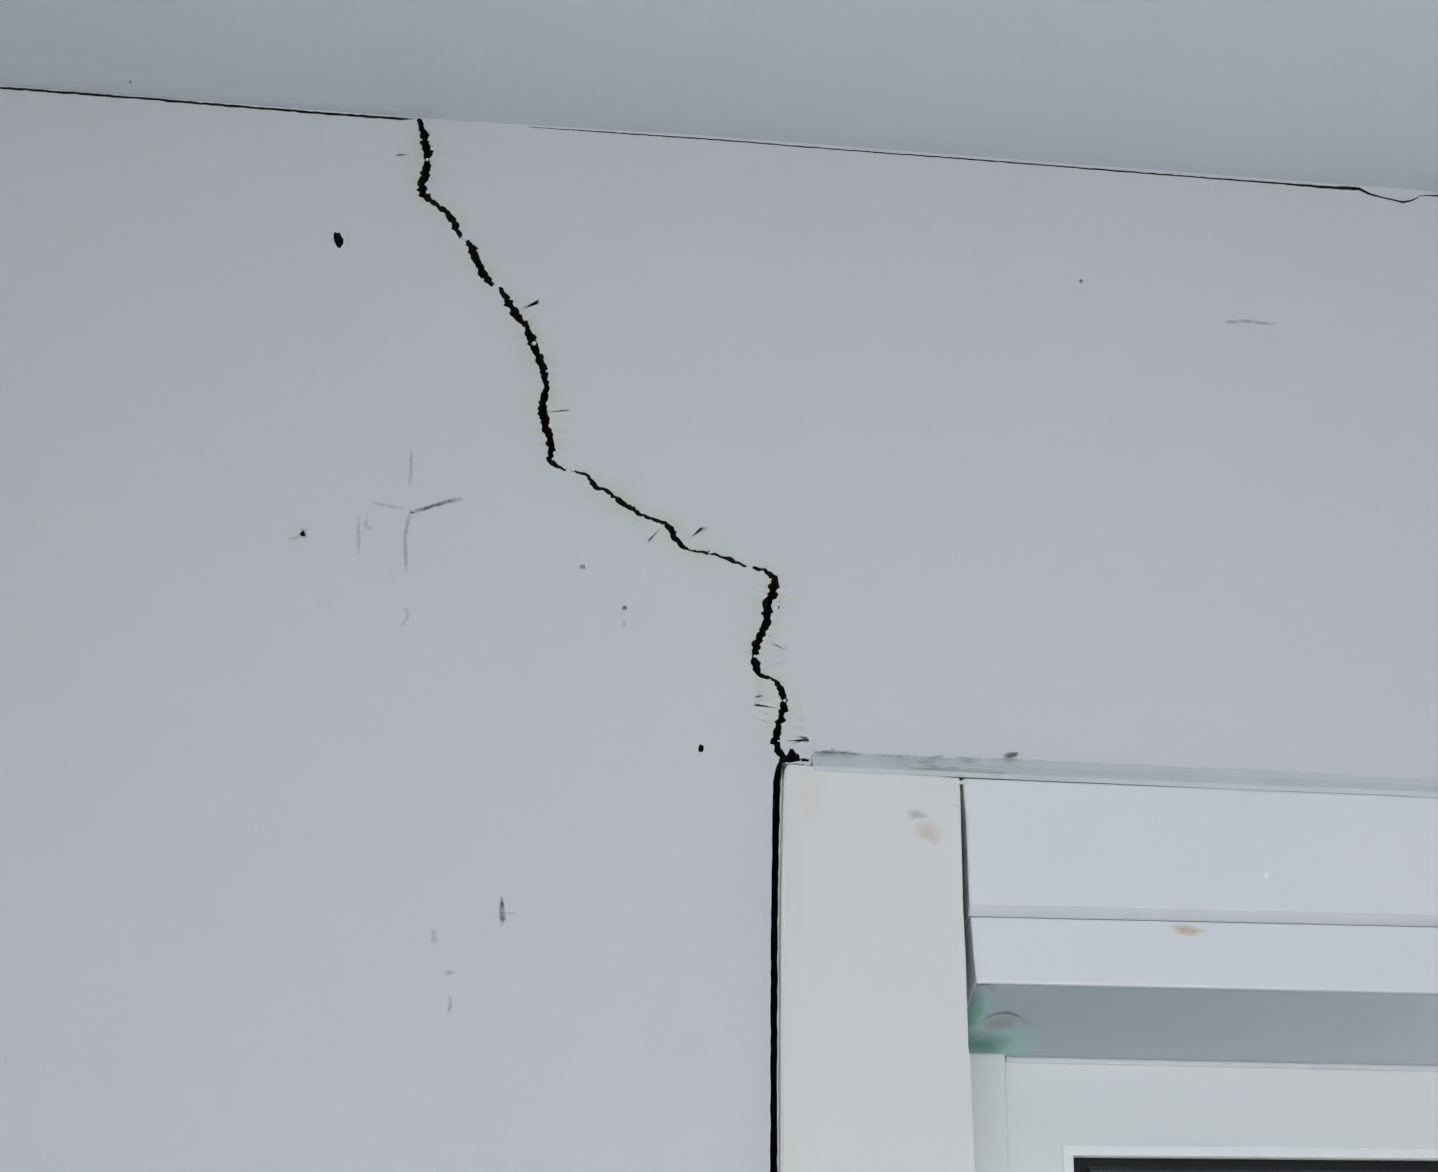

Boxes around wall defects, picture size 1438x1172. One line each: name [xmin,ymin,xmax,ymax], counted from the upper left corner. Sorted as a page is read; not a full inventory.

crack [0,87,793,1172]
crack [804,748,1438,798]